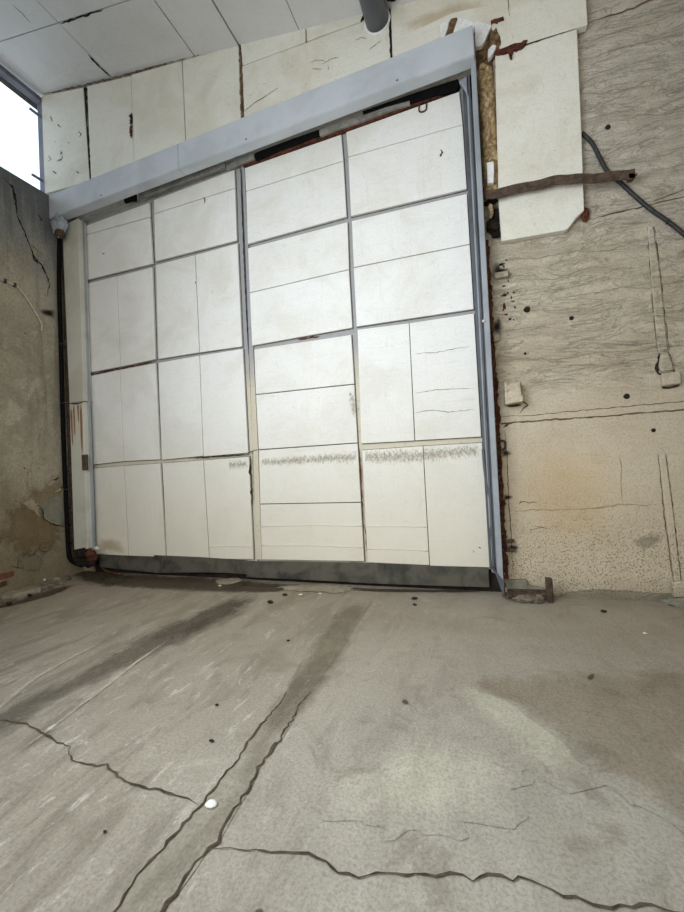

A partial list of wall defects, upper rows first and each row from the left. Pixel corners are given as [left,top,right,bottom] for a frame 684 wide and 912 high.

crack [3,177,50,295]
rust [70,402,83,448]
flaking render [23,484,65,527]
leakage [75,571,299,592]
crack [1,691,679,912]
leakage [455,663,684,833]